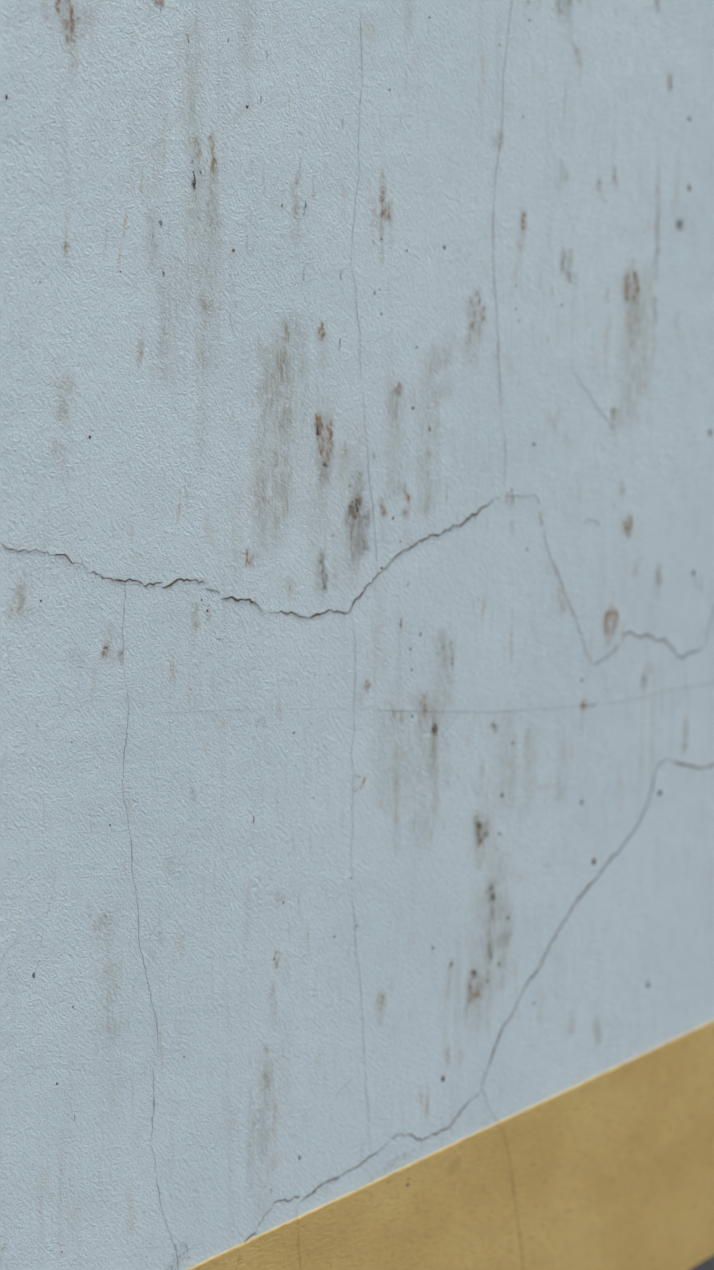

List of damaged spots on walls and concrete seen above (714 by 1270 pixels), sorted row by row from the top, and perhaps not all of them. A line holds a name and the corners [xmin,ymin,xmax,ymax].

corrosion [315,414,333,466]
crack [0,497,499,619]
crack [526,761,713,985]
crack [413,1100,470,1141]
crack [277,1149,381,1202]